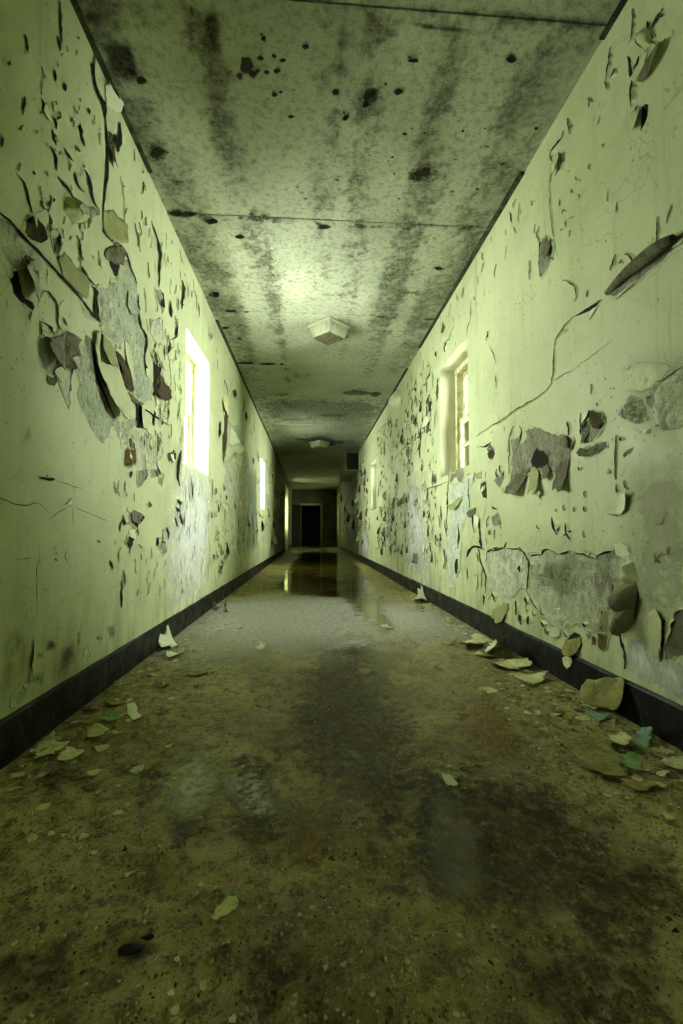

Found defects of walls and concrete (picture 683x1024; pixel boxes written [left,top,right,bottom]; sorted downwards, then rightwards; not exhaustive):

peeling [41,98,52,123]
peeling [105,83,126,168]
leakage [85,7,286,380]
leakage [329,83,403,145]
peeling [627,44,659,131]
peeling [0,198,187,488]
crack [0,2,257,610]
crack [394,42,618,605]
peeling [123,500,152,548]
peeling [157,527,171,556]
flaking render [340,300,683,799]
peeling [0,573,277,795]